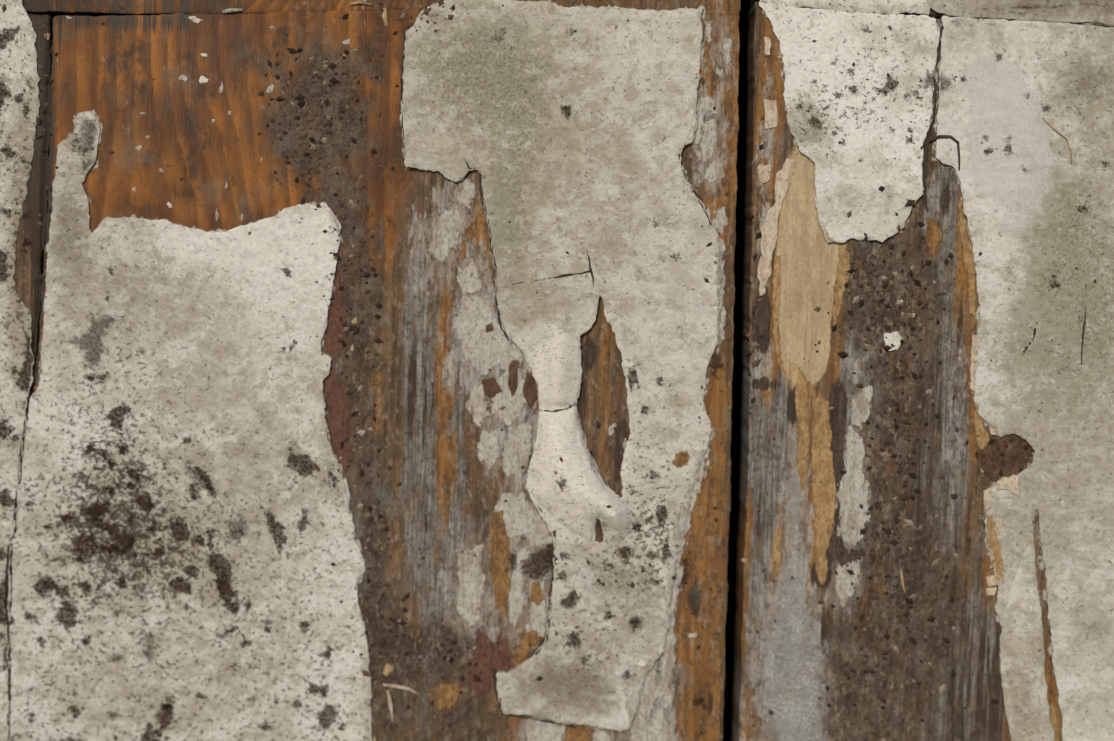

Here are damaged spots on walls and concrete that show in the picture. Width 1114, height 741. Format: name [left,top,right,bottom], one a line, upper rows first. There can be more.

peeling [0,0,394,741]
peeling [400,0,732,741]
peeling [757,0,1114,741]